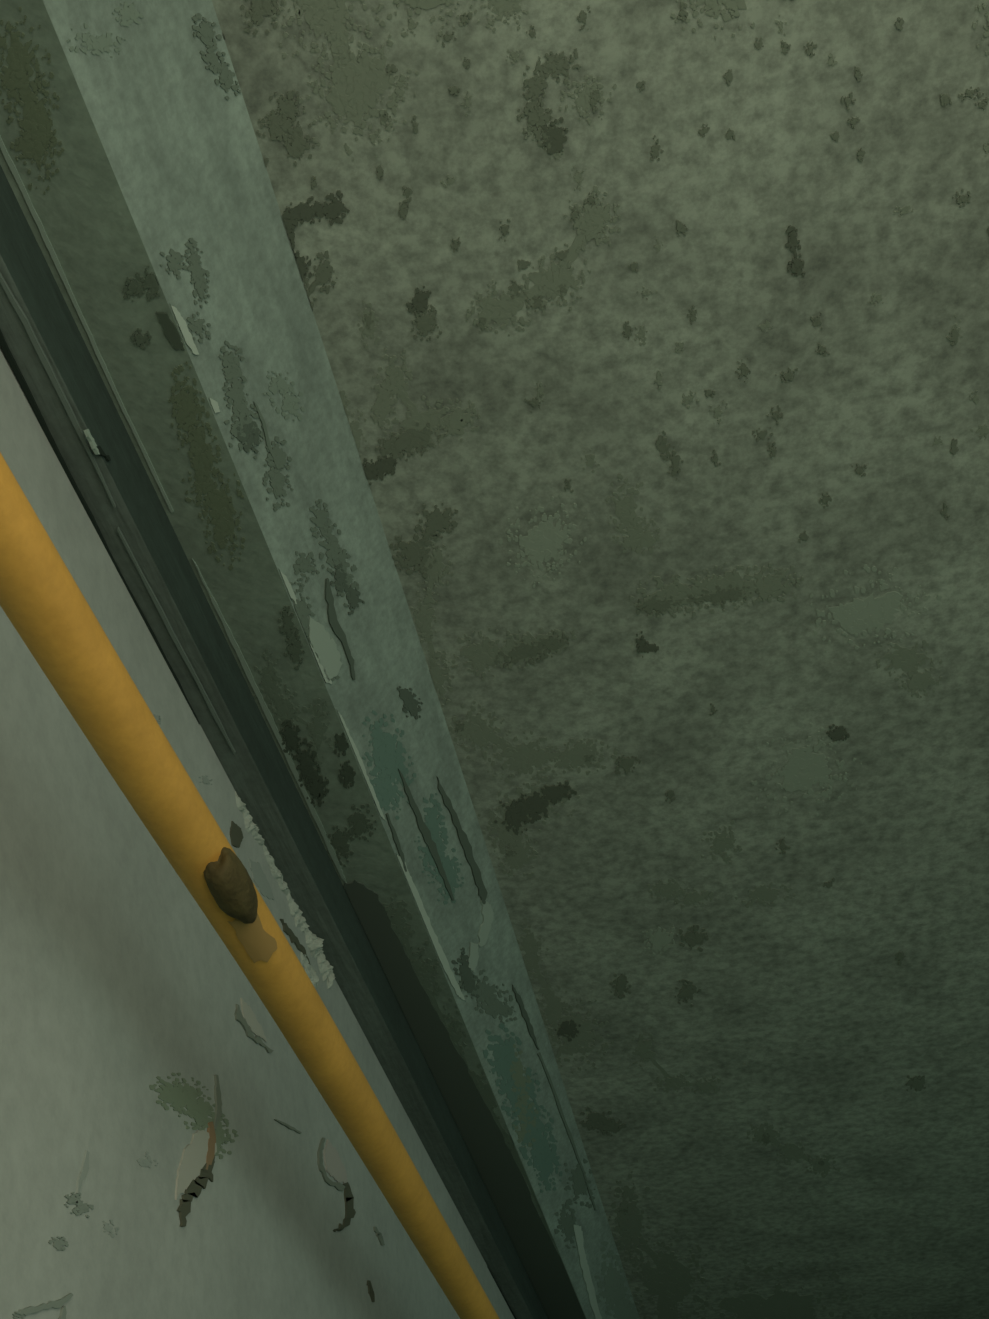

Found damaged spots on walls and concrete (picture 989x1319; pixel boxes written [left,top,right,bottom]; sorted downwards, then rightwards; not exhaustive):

spalling [156,304,199,355]
peeling [192,558,347,883]
peeling [336,709,386,821]
flaking render [230,791,336,989]
peeling [395,853,466,1002]
crack [386,769,488,904]
peeling [175,1130,217,1200]
crack [176,1075,222,1227]
crack [274,1119,385,1246]
crack [14,1293,73,1319]
crack [367,1280,375,1302]
peeling [574,1225,602,1319]